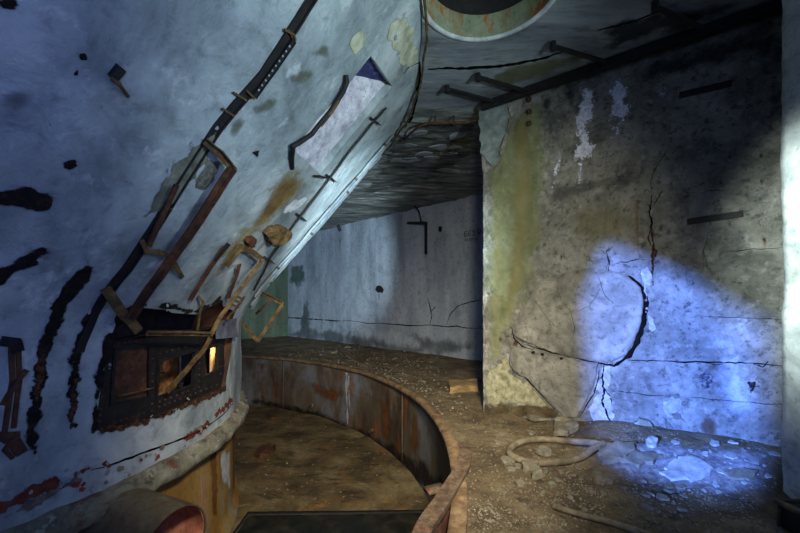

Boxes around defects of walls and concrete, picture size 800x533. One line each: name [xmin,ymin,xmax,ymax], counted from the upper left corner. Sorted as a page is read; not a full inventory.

crack [403,52,562,128]
peeling [0,239,55,286]
peeling [0,186,57,215]
peeling [143,126,221,217]
rust [188,171,300,331]
spalling [363,104,512,195]
water stain [487,74,631,356]
crack [601,152,666,284]
crack [288,300,479,329]
peeling [24,266,93,455]
crack [526,344,665,421]
crack [631,359,780,367]